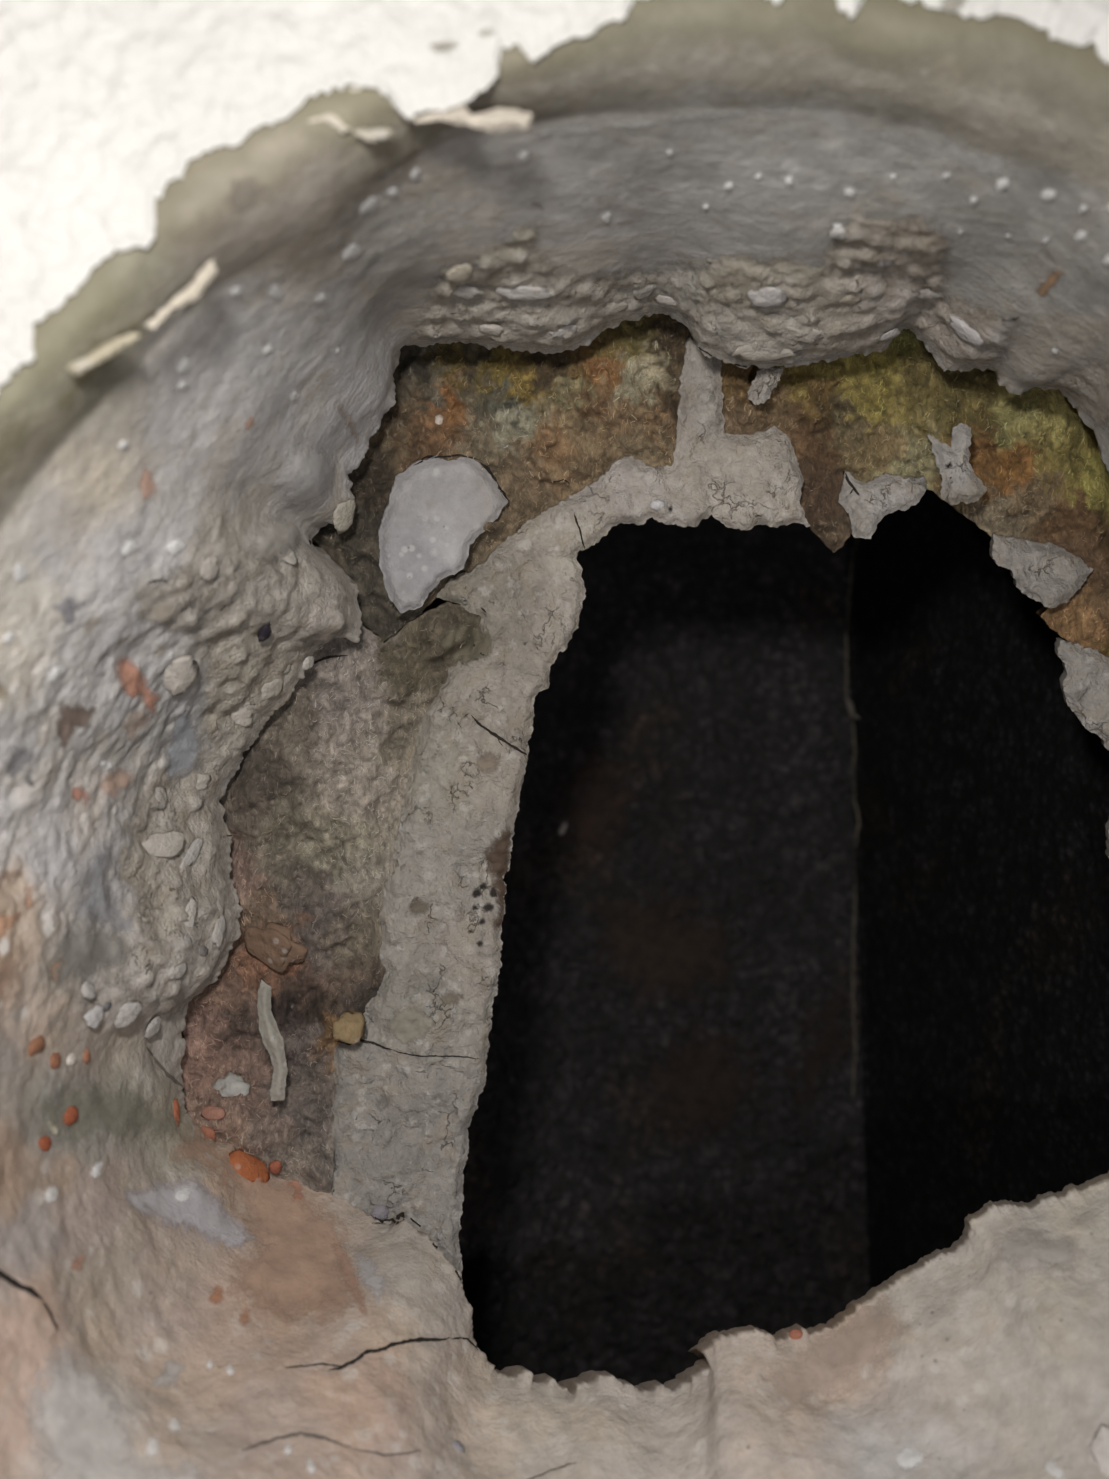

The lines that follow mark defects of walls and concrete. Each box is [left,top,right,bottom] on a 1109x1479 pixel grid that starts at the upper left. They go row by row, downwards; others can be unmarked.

peeling [493,0,1109,112]
peeling [0,84,532,420]
flaking render [408,207,1019,368]
leakage [61,331,134,406]
flaking render [332,499,356,535]
flaking render [66,513,355,1039]
crack [286,1337,479,1371]
crack [242,1432,421,1456]